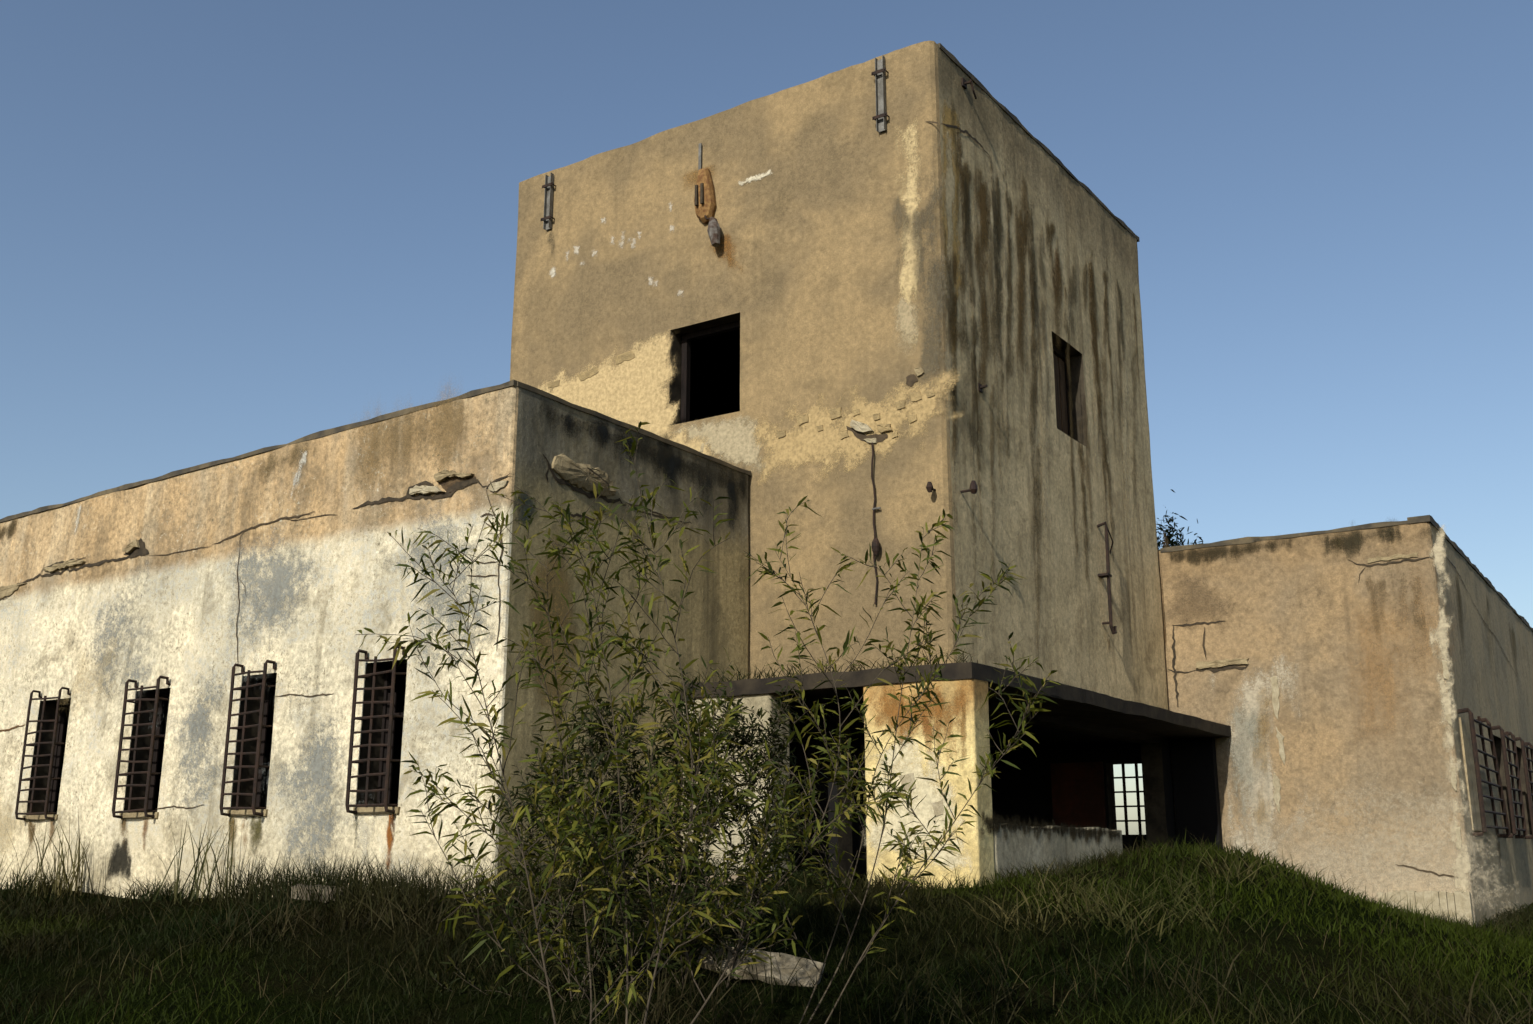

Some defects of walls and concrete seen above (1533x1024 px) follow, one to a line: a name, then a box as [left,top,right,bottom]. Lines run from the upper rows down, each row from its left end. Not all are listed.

corrosion [713,235,732,261]
leakage [896,105,1139,573]
peeling [538,333,955,481]
leakage [0,519,16,538]
crack [17,511,336,668]
crack [467,491,503,651]
leakage [1170,539,1291,564]
leakage [1325,525,1399,555]
crack [1168,621,1249,707]
corrosion [876,689,966,741]